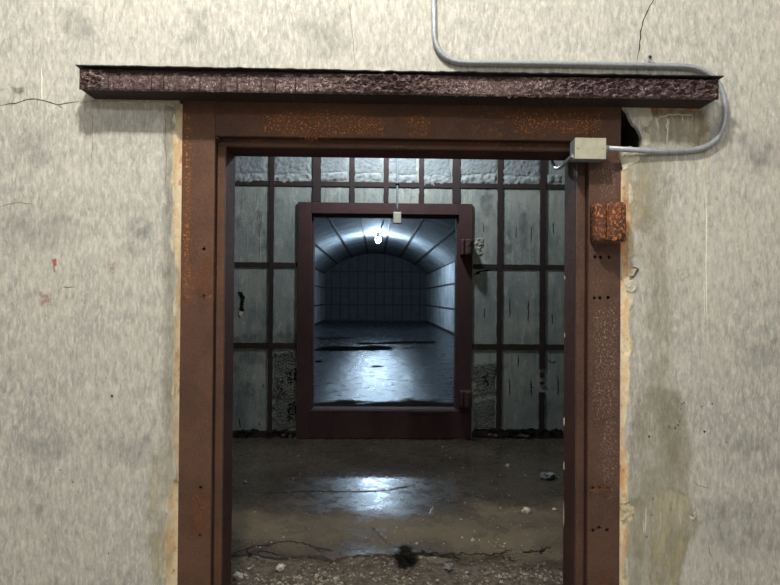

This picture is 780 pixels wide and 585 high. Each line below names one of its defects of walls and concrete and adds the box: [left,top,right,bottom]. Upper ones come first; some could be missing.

crack [637,0,654,69]
crack [5,98,93,159]
peeling [633,108,653,146]
spalling [98,100,183,585]
rust [592,300,620,499]
spalling [619,152,640,585]
crack [231,540,331,556]
crack [413,547,551,562]
water stain [643,490,696,585]